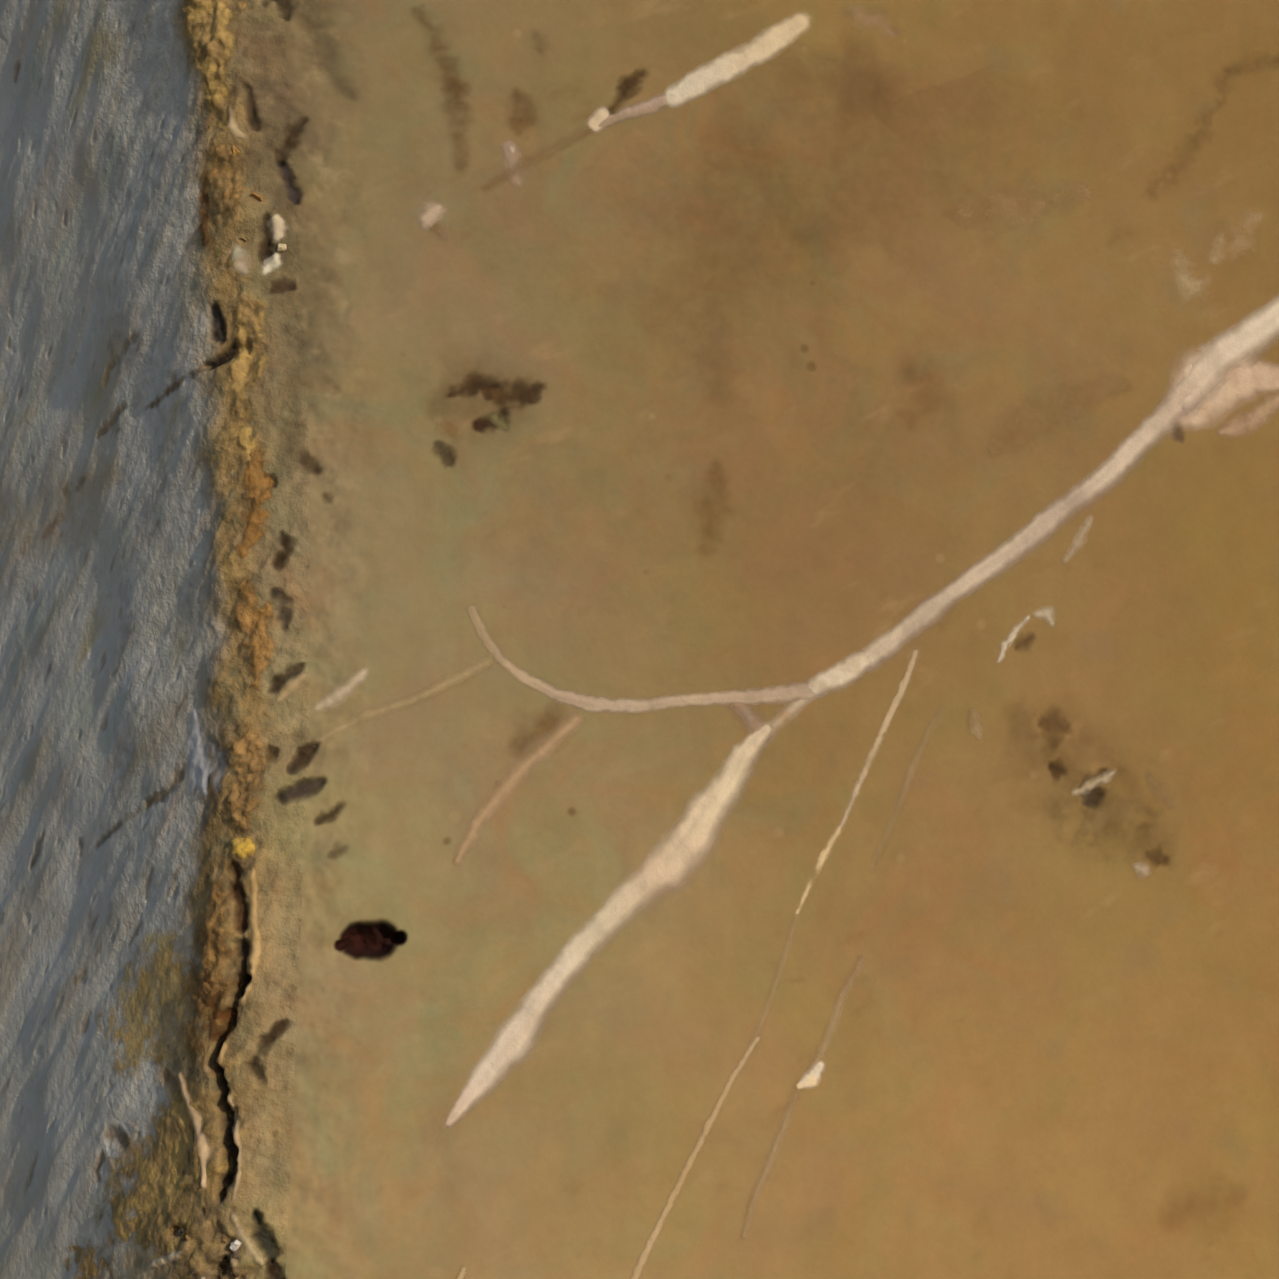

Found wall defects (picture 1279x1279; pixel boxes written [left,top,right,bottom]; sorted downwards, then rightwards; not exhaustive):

crack [588,14,809,132]
crack [316,299,1279,1126]
spalling [148,1226,190,1279]
crack [167,862,286,1202]
spalling [191,1211,283,1279]
crack [631,1036,760,1279]
crack [743,960,862,1237]